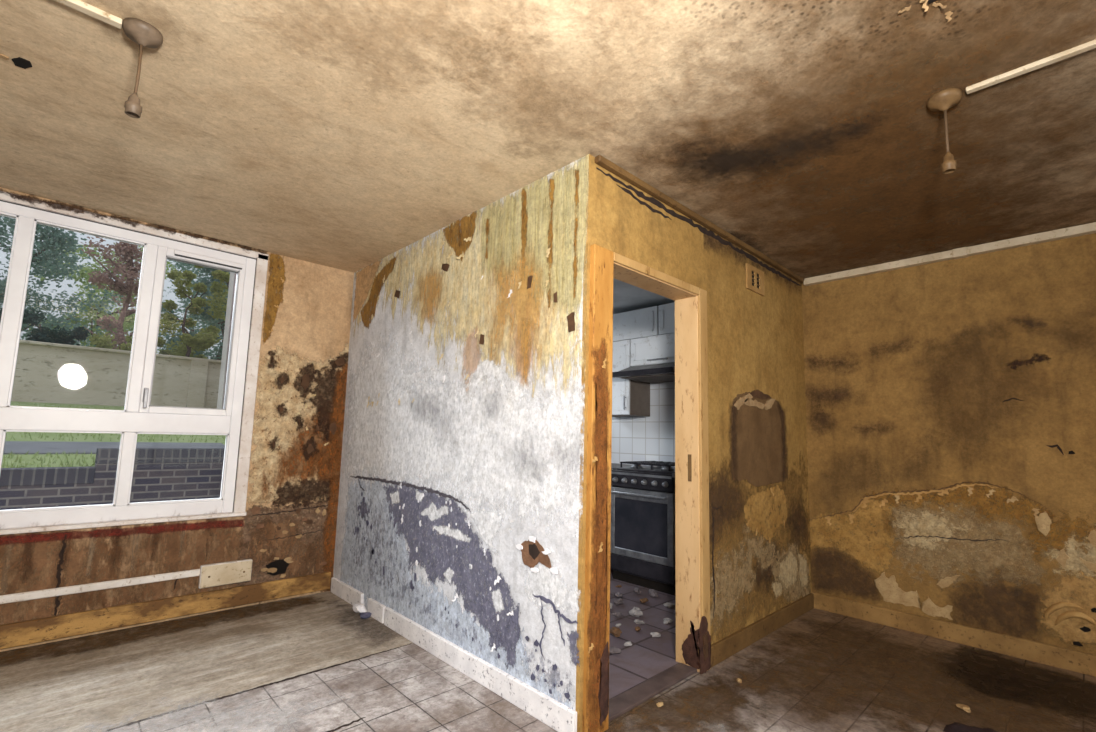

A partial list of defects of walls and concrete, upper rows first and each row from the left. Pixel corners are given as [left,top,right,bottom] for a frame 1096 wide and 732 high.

peeling [898,0,953,22]
water stain [638,0,1096,278]
crack [596,167,801,286]
peeling [236,154,610,732]
flaking render [729,389,788,542]
water stain [0,518,243,625]
water stain [0,596,324,666]
flaking render [771,481,1053,620]